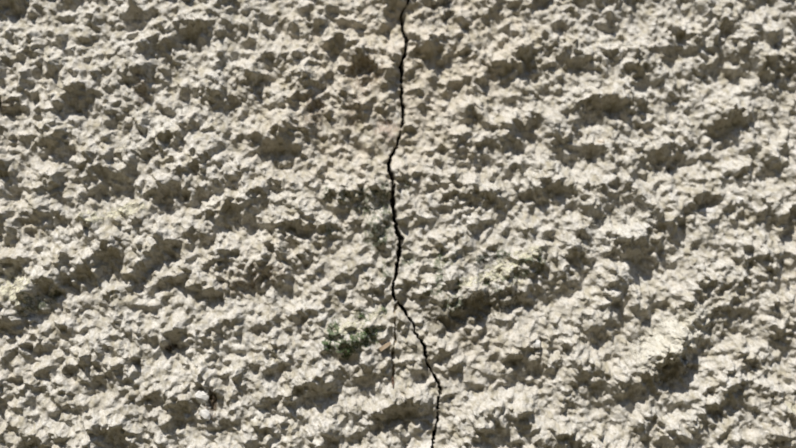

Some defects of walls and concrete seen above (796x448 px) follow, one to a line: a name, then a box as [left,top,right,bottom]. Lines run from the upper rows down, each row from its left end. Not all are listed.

crack [386,0,442,448]